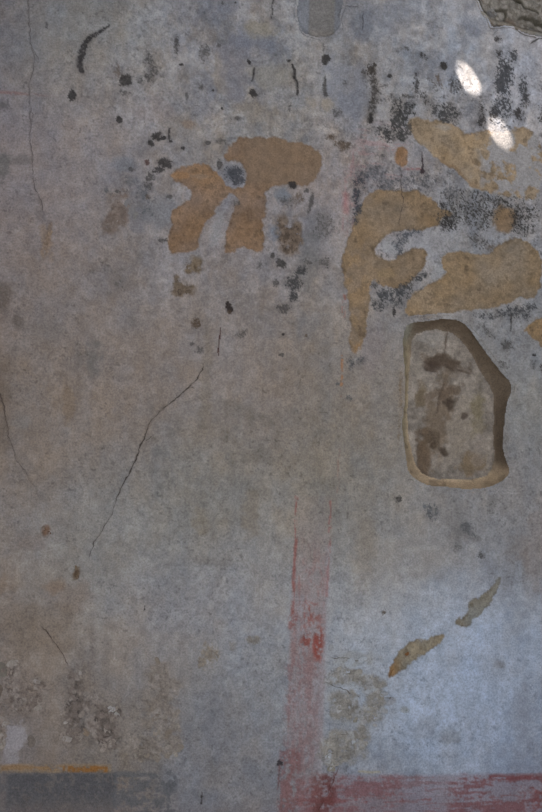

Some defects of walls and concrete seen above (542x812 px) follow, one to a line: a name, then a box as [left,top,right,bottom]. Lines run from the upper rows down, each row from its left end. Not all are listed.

spalling [472,0,542,42]
crack [27,0,43,211]
damp [145,126,186,151]
damp [360,61,464,146]
damp [476,34,542,137]
spalling [272,211,306,261]
damp [255,252,333,315]
damp [349,162,542,258]
crack [0,392,39,497]
crack [89,359,209,557]
flaking render [454,575,503,628]
peeling [314,633,446,774]